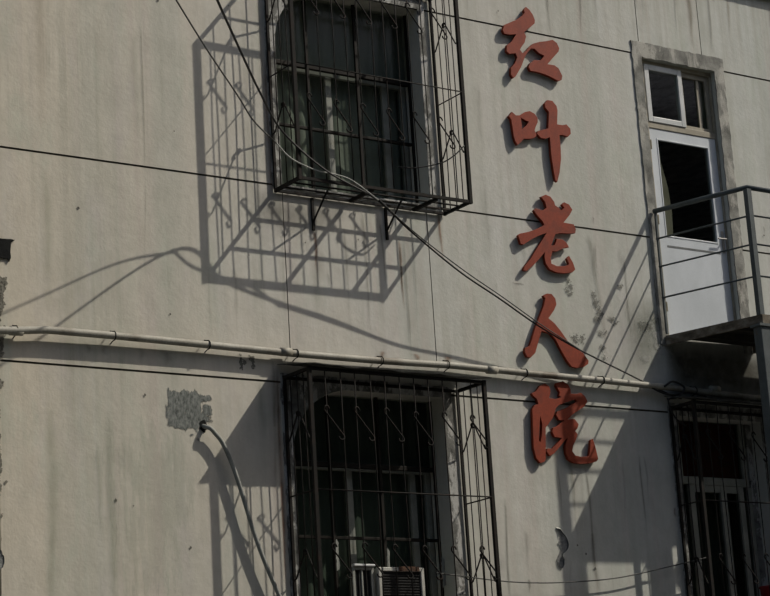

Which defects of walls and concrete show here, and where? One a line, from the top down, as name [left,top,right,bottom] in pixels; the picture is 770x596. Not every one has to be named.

spalling [0,276,8,360]
peeling [591,292,619,361]
peeling [190,395,213,441]
spalling [556,527,578,570]